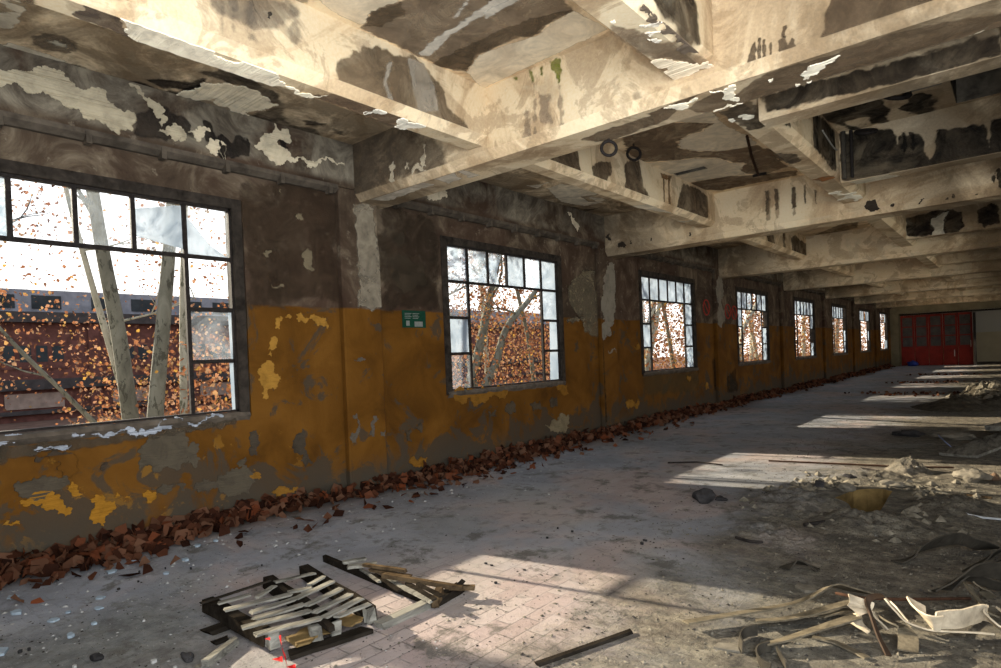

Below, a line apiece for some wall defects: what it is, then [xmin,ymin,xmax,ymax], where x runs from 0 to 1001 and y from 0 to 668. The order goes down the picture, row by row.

peeling [0,65,137,135]
peeling [129,83,226,160]
peeling [121,18,328,116]
peeling [254,123,345,168]
water stain [313,94,402,127]
water stain [337,0,572,128]
water stain [527,182,605,212]
water stain [550,151,612,181]
peeling [639,4,714,80]
water stain [582,14,1001,229]
water stain [822,0,932,37]
peeling [0,418,261,526]